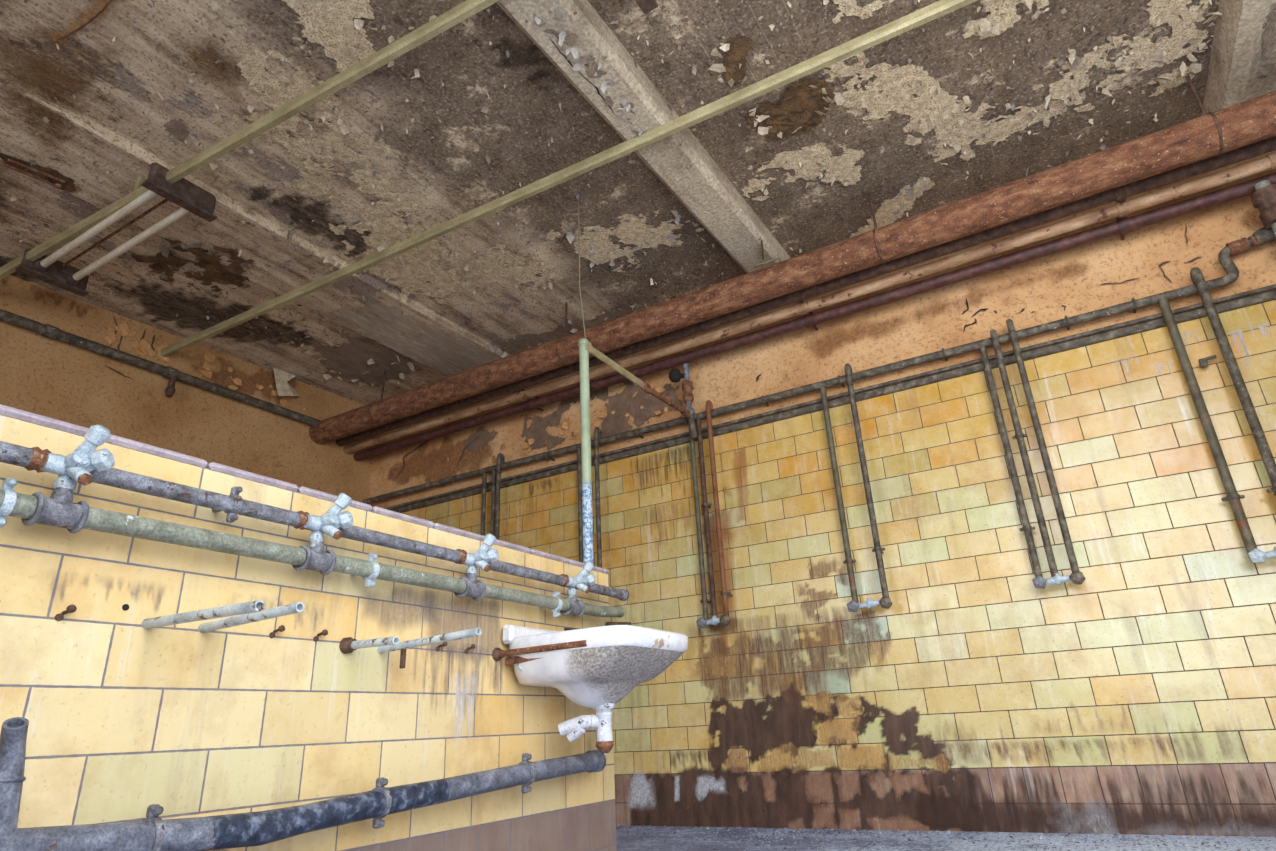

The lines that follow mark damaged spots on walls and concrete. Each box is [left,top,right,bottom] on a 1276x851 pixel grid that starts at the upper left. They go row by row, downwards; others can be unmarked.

peeling [609,0,806,109]
peeling [733,0,1223,238]
spalling [0,153,132,255]
spalling [725,691,950,831]
damp [631,563,1276,837]